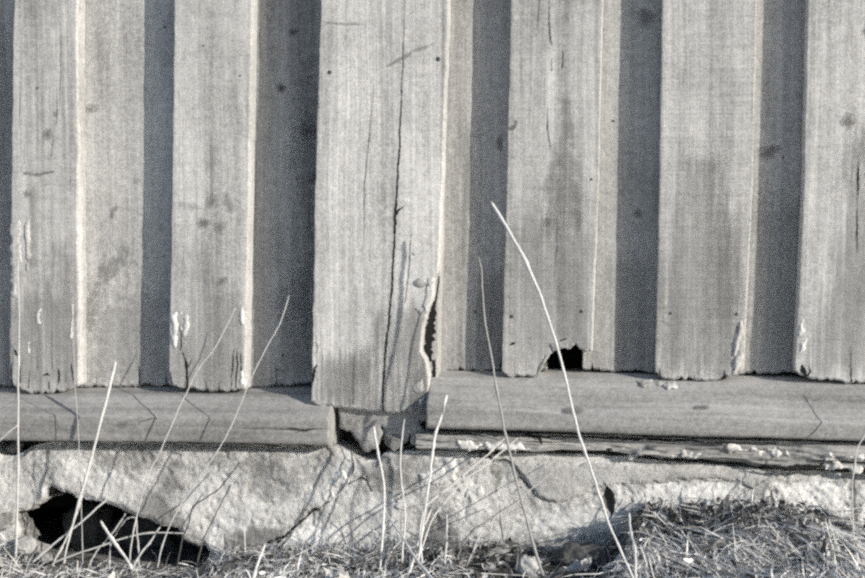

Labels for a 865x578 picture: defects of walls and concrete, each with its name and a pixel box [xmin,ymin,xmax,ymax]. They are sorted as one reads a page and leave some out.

crack [382,9,415,412]
crack [424,276,440,377]
spalling [0,486,71,562]
spalling [181,532,206,547]
crack [265,462,372,544]
crack [416,432,865,503]